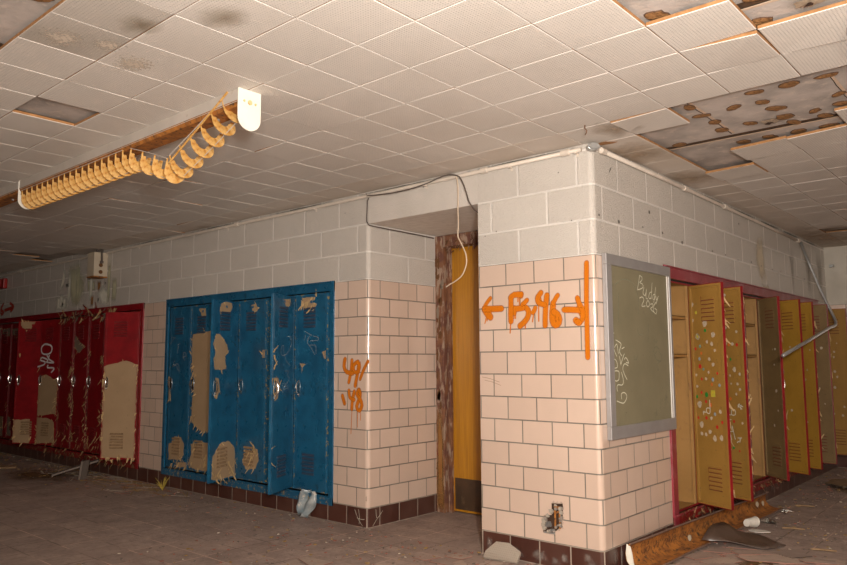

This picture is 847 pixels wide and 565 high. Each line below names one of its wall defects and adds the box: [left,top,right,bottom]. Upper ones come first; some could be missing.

peeling [0,0,61,47]
peeling [617,0,715,24]
peeling [732,0,844,37]
peeling [16,96,97,123]
peeling [639,65,847,171]
spalling [541,503,564,534]